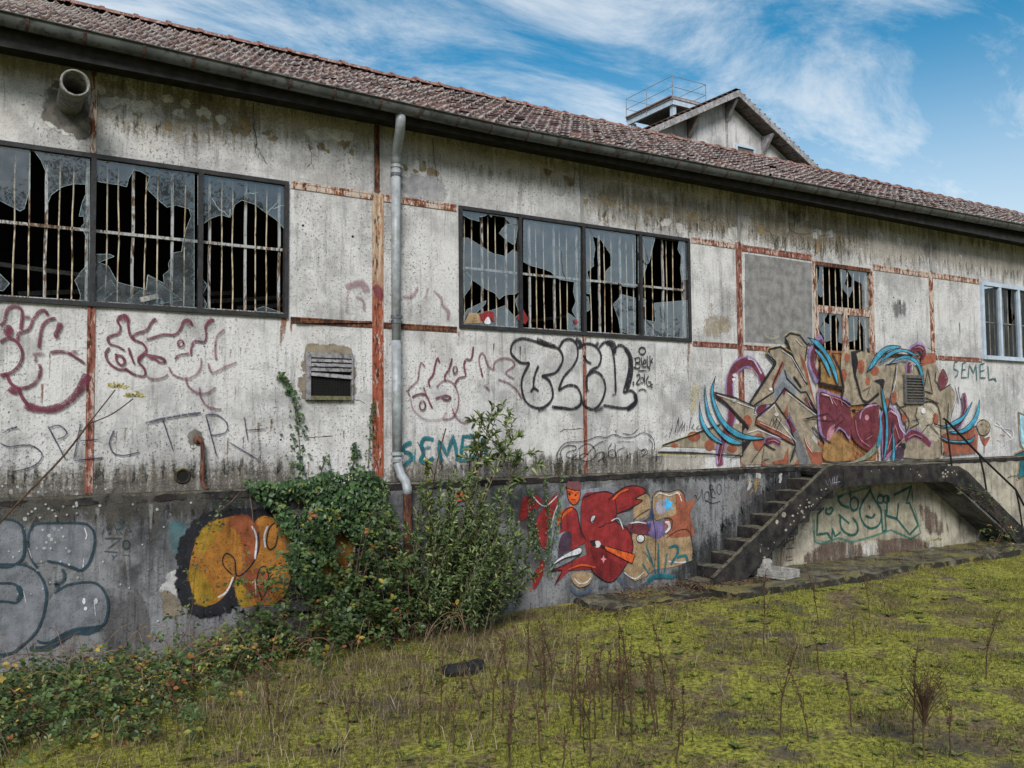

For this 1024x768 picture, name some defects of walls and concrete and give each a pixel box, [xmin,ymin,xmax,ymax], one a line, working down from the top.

spalling [298,343,356,402]
damp [0,457,295,574]
damp [384,453,804,580]